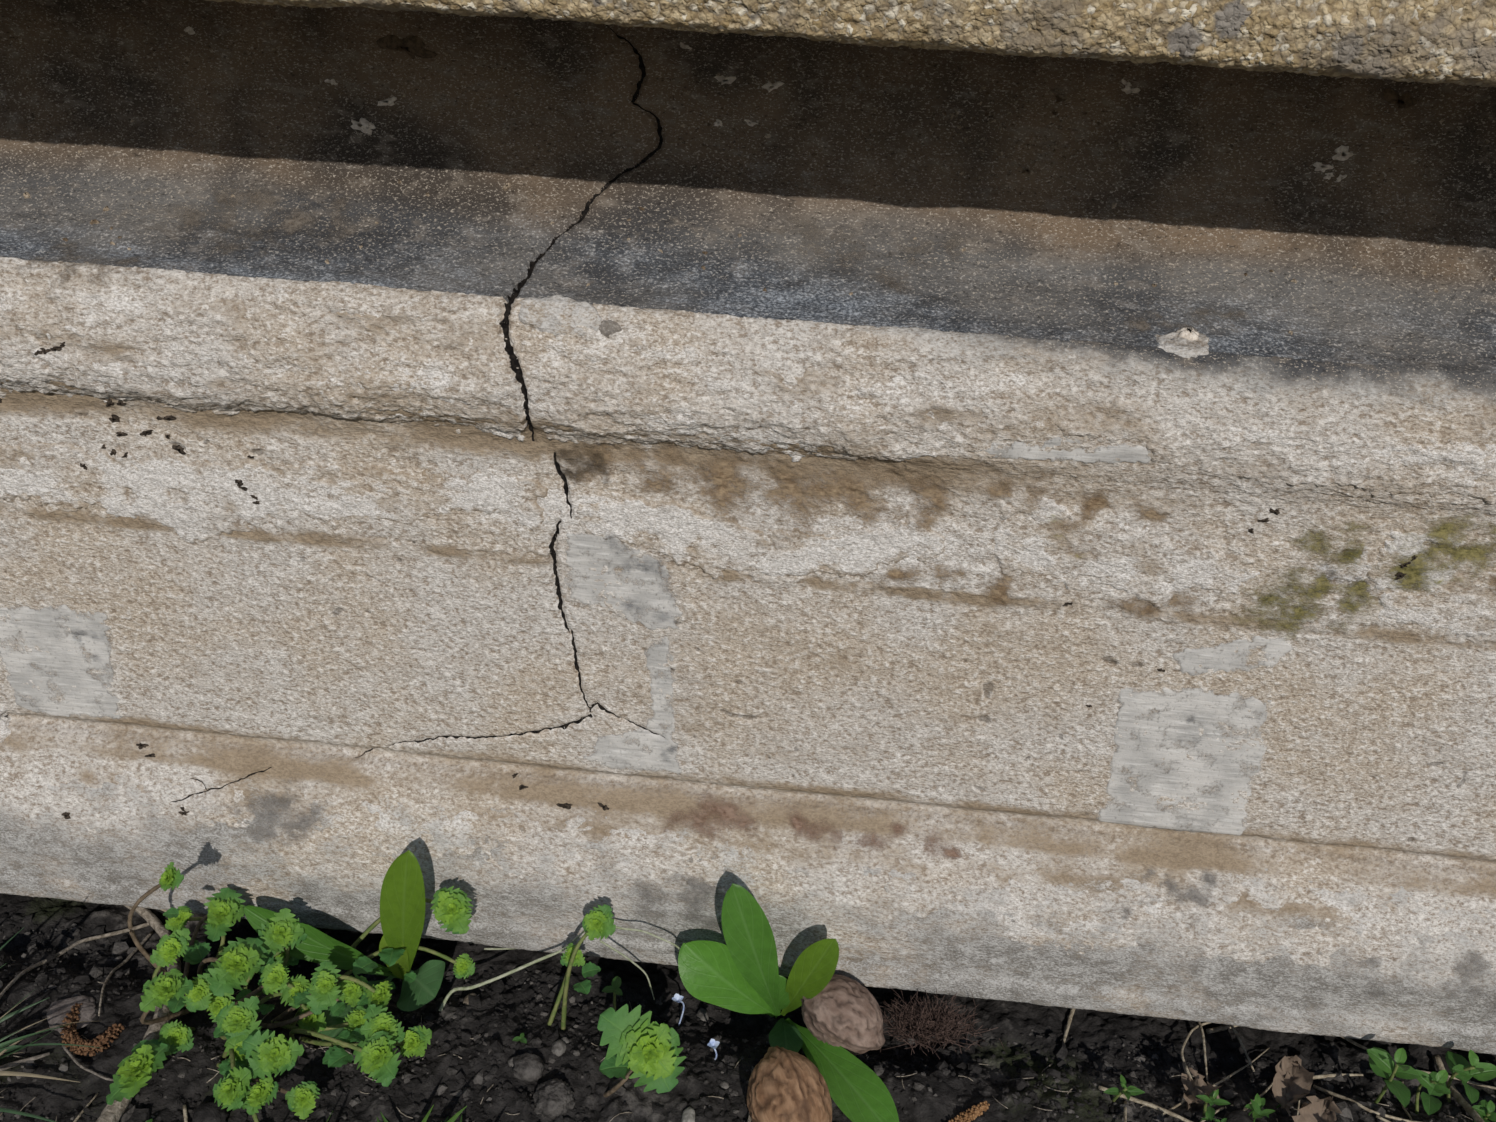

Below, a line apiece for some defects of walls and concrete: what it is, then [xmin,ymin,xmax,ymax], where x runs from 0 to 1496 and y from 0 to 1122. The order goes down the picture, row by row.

crack [355,24,665,758]
leakage [1248,508,1280,534]
leakage [1395,556,1418,580]
leakage [1149,870,1215,905]